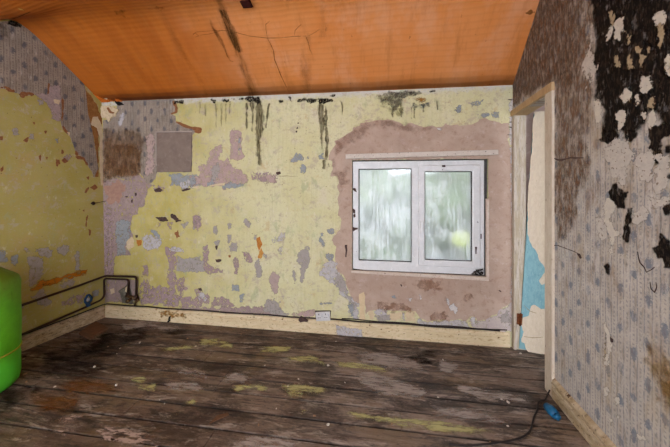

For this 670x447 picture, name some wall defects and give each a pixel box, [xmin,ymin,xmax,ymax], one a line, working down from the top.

crack [193,23,320,92]
peeling [605,10,651,69]
peeling [652,10,667,48]
damp [279,94,335,169]
damp [380,90,435,117]
damp [513,0,670,243]
peeling [594,99,604,124]
peeling [603,76,670,225]
peeling [61,89,332,322]
flaking render [318,98,513,332]
corrosion [30,270,87,291]
peeling [521,305,545,354]